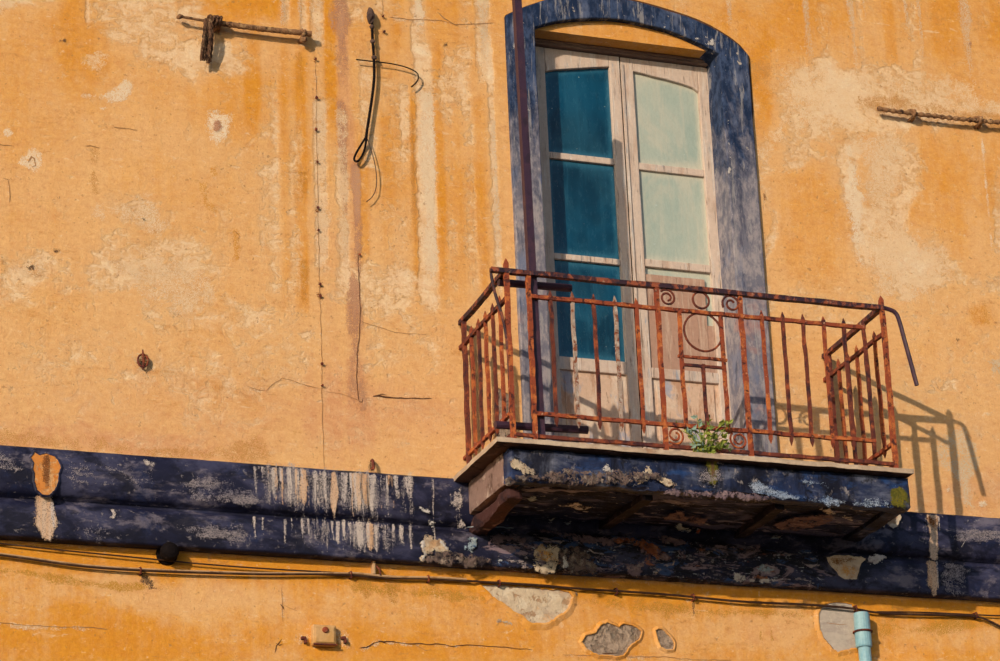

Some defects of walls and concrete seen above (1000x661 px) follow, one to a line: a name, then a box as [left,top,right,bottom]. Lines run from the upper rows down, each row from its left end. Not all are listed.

water stain [279,0,354,85]
water stain [298,99,368,428]
crack [249,63,432,468]
peeling [29,450,63,542]
water stain [0,428,412,552]
spalling [505,459,890,539]
flaking render [419,506,597,631]
flaking render [614,511,711,578]
water stain [925,514,940,596]
crack [361,640,531,652]
flaking render [578,619,677,661]
spalling [814,597,858,658]